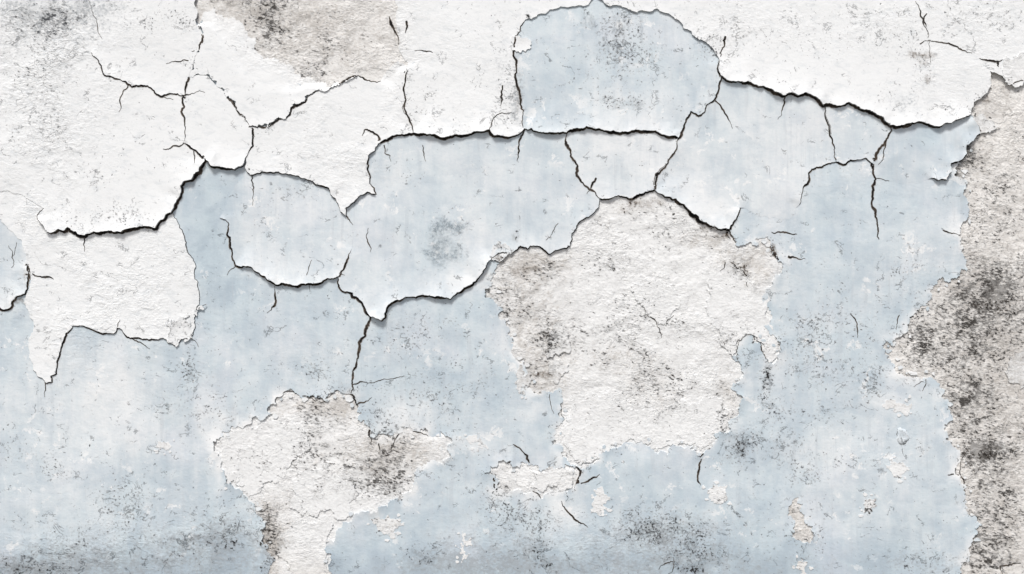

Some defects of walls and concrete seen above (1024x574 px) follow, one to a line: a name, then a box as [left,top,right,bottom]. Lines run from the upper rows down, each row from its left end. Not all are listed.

crack [0,242,53,312]
peeling [0,0,599,383]
crack [37,1,981,406]
flaking render [485,0,1024,574]
crack [915,1,1024,84]
flaking render [215,389,488,574]